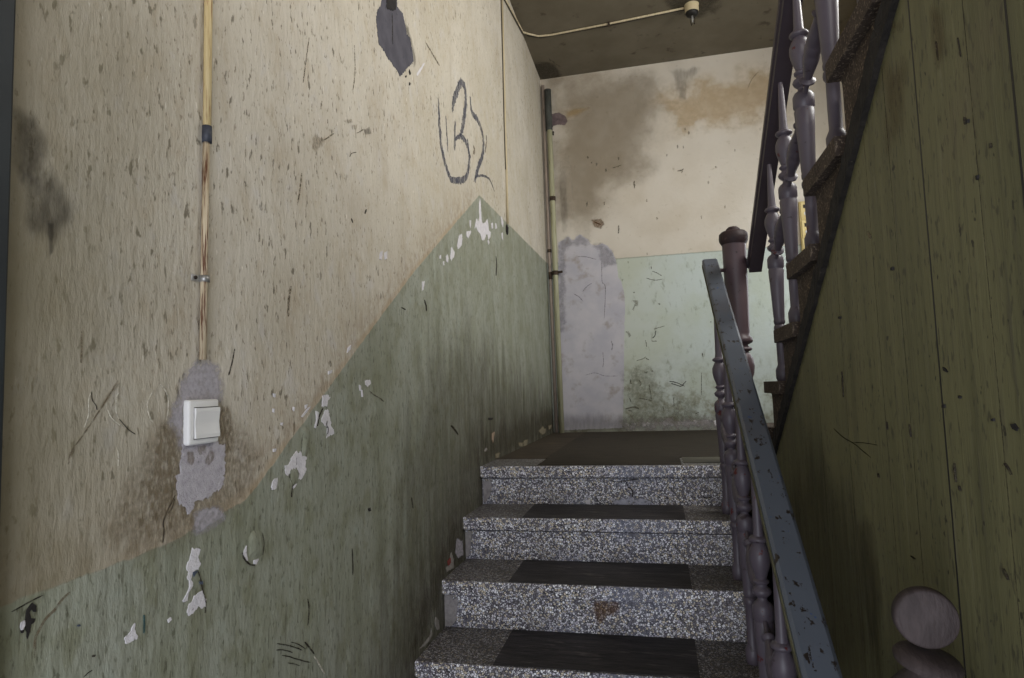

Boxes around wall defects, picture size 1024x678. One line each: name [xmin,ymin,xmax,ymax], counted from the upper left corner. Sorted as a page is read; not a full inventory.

peeling [439,200,503,265]
peeling [292,394,334,438]
peeling [271,451,307,497]
peeling [182,548,206,616]